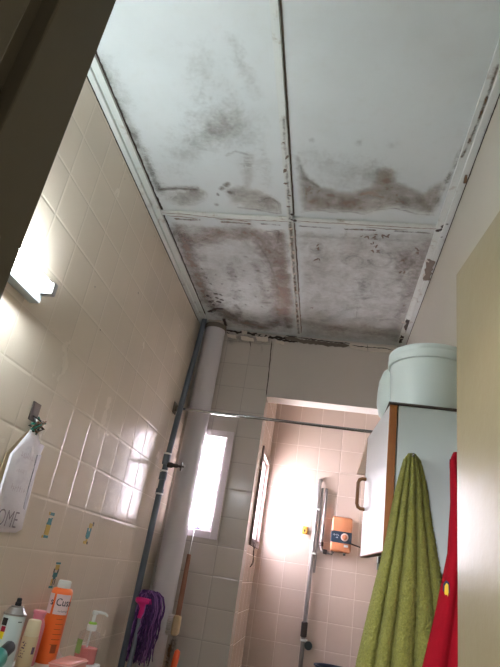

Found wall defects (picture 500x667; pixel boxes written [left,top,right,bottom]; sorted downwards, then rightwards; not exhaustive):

leakage [303,172,406,210]
leakage [178,230,290,328]
spalling [276,183,410,353]
spalling [423,259,435,281]